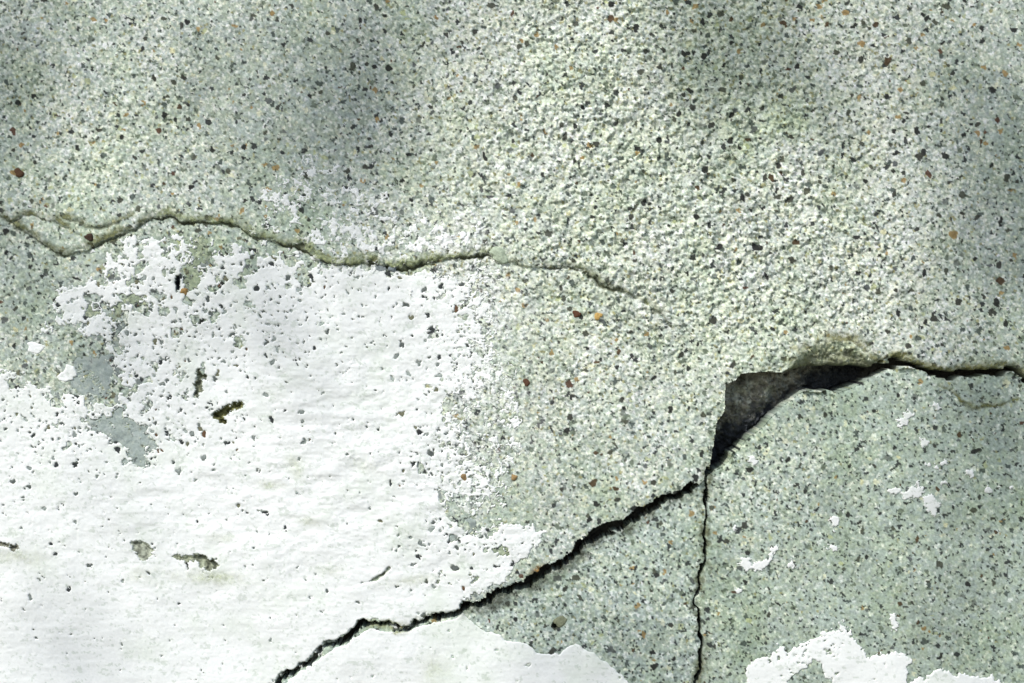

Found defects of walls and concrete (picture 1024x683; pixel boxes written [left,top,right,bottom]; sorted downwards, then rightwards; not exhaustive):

crack [0,213,681,345]
crack [858,356,1024,411]
peeling [0,228,628,683]
crack [275,466,710,683]
peeling [745,620,1001,683]